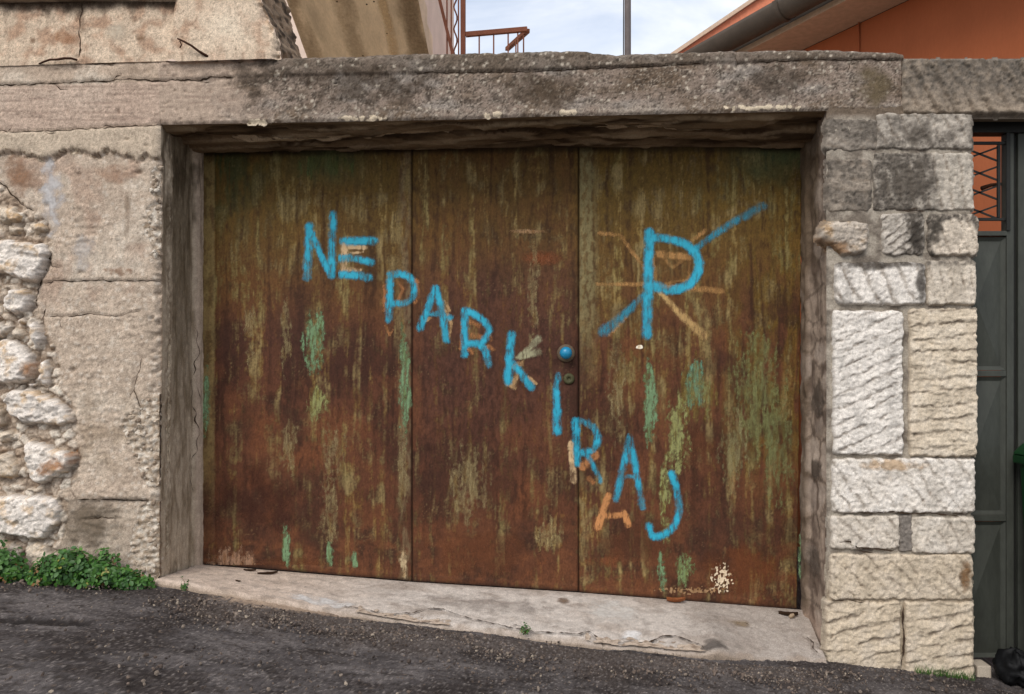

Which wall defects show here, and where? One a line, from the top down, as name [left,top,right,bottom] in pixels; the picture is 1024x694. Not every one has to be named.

crack [0,3,233,89]